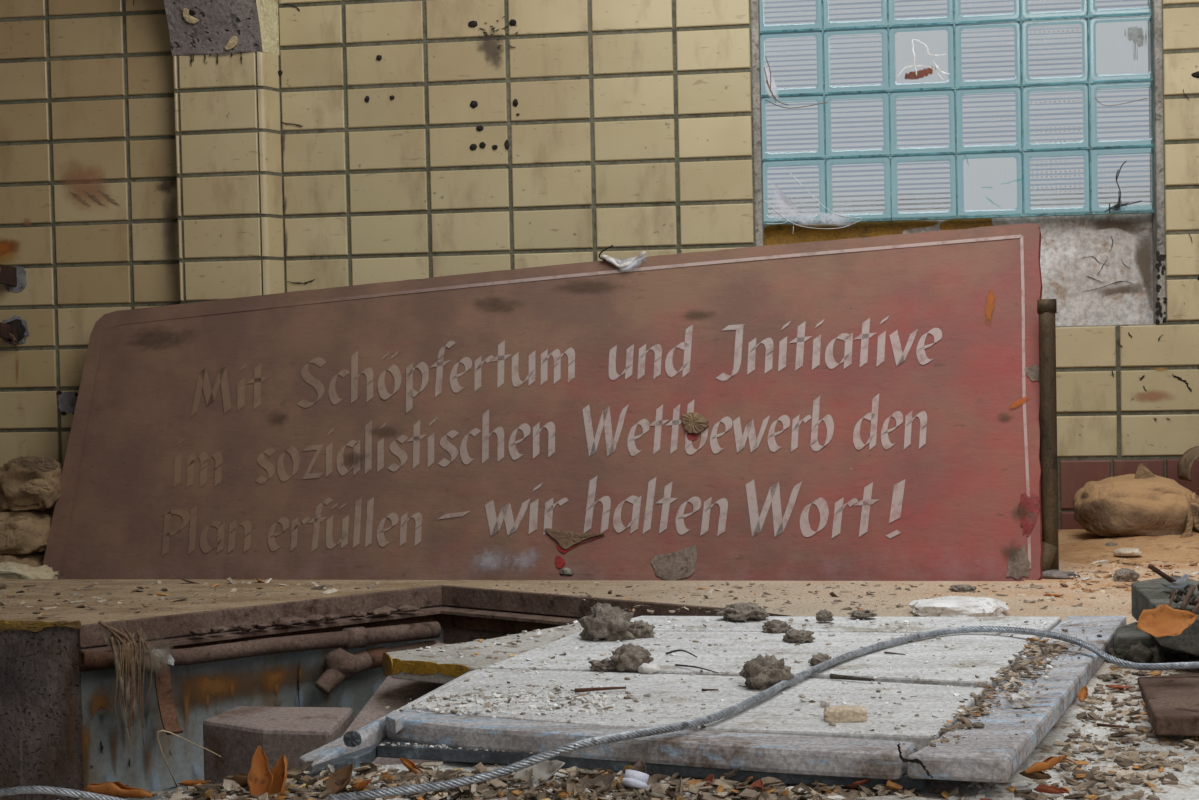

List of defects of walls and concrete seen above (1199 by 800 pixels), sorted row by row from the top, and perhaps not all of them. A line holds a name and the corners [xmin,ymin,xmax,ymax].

spalling [183,8,199,24]
spalling [225,36,238,50]
corrosion [171,665,324,730]